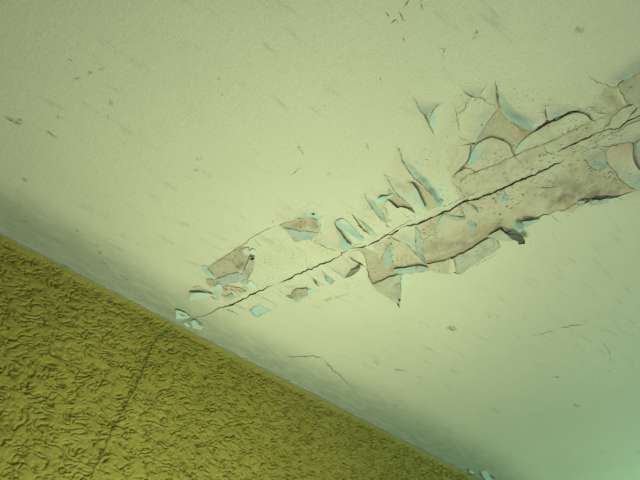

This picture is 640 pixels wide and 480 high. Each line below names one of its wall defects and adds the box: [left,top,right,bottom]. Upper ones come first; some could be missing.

peeling [175,310,204,330]
peeling [189,240,279,317]
crack [4,132,597,480]
peeling [272,61,640,308]